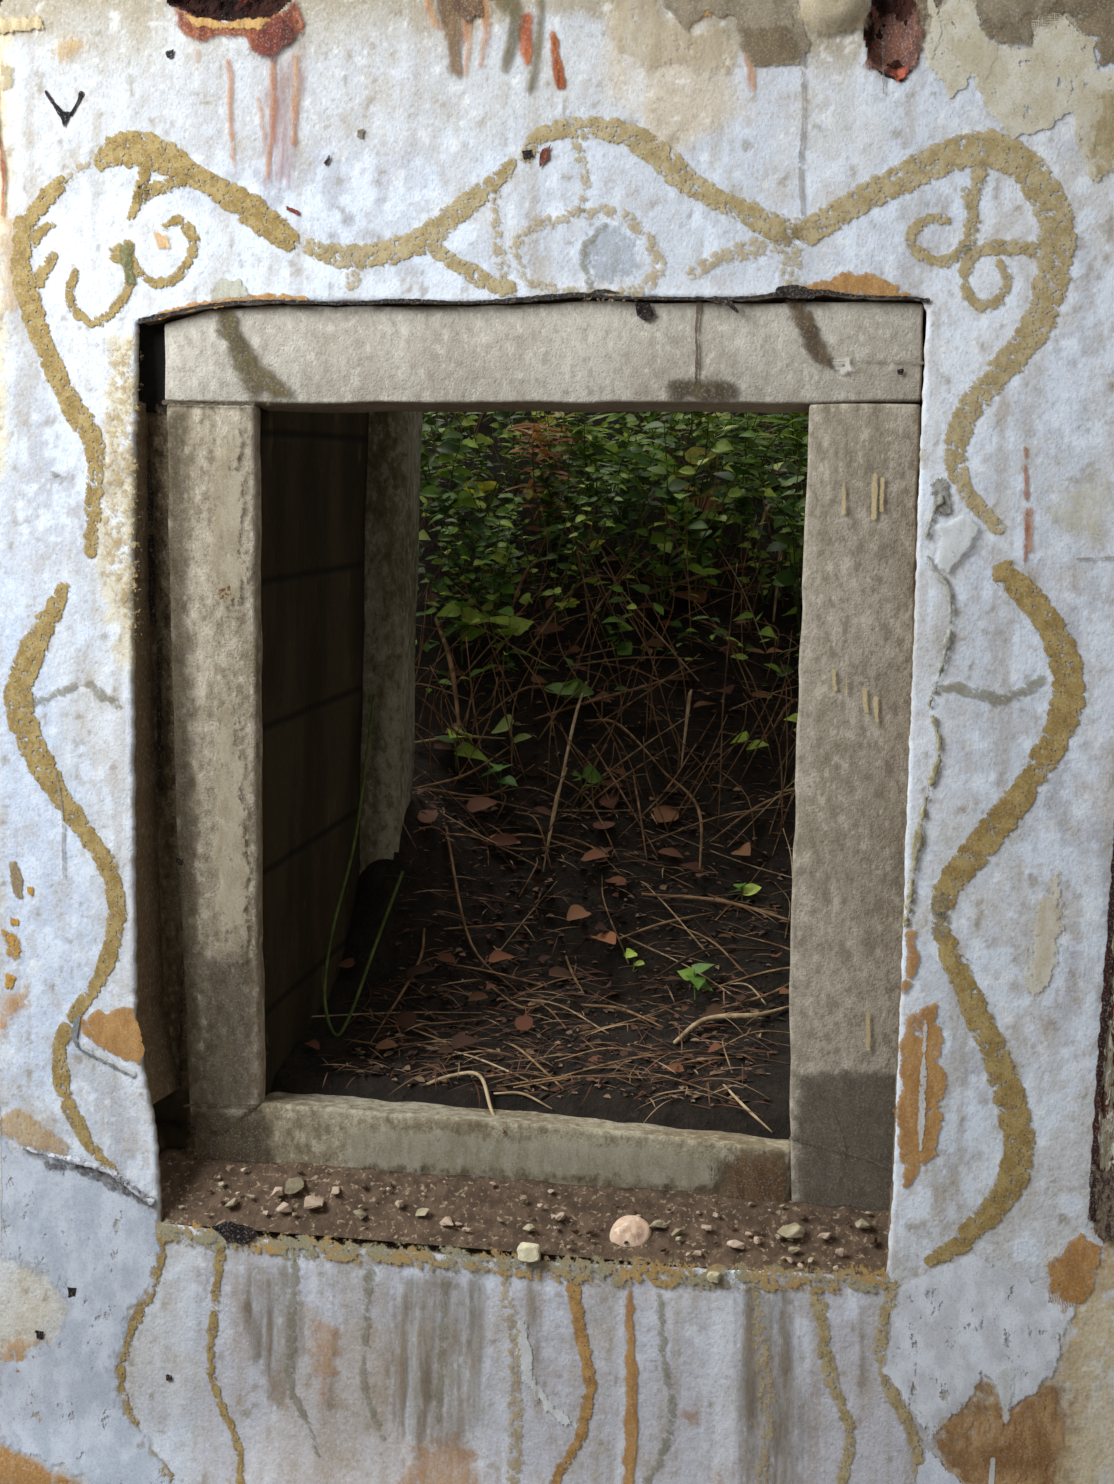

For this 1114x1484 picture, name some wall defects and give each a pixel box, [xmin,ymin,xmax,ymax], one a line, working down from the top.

spalling [165,0,304,61]
corrosion [263,55,302,179]
corrosion [425,0,565,91]
peeling [662,0,811,67]
peeling [863,0,1114,183]
corrosion [0,142,25,309]
peeling [9,861,23,898]
corrosion [0,917,28,1031]
peeling [79,1006,145,1077]
corrosion [1087,839,1114,1246]
peeling [0,1108,169,1484]
peeling [882,1233,1103,1484]